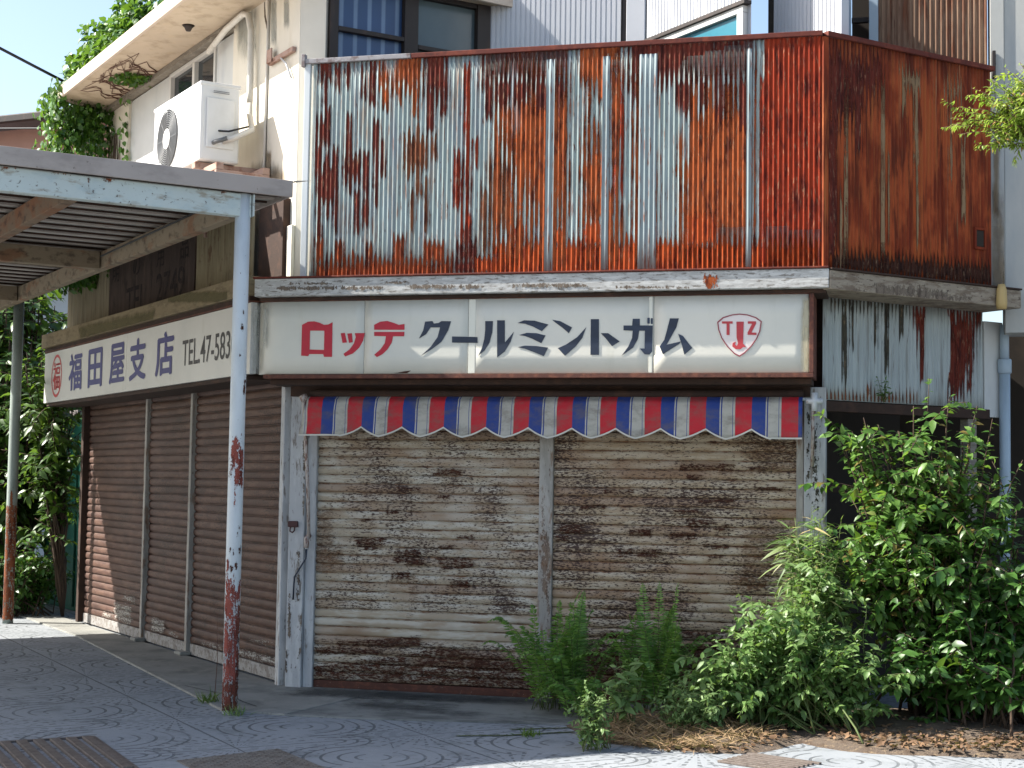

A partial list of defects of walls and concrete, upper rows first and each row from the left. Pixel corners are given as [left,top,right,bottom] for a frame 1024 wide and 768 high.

corrosion [313,36,991,289]
corrosion [823,306,925,404]
corrosion [947,309,981,404]
corrosion [678,463,775,480]
corrosion [580,489,634,509]
corrosion [556,521,585,543]
corrosion [617,497,733,560]
corrosion [353,536,475,588]
corrosion [313,635,536,689]